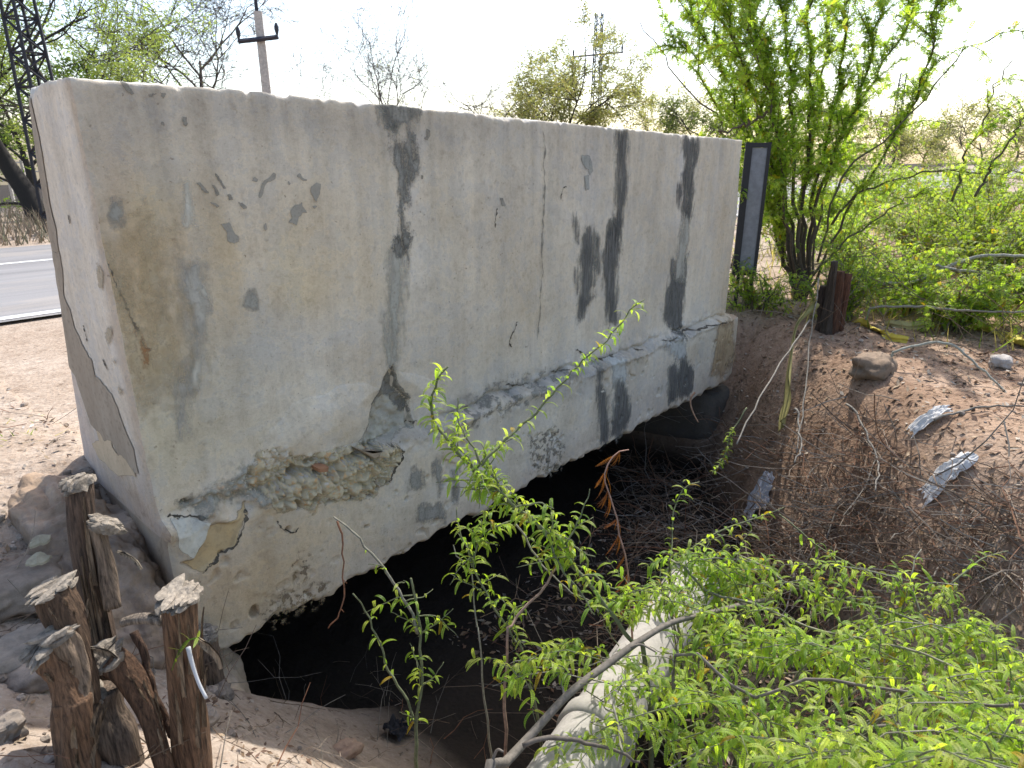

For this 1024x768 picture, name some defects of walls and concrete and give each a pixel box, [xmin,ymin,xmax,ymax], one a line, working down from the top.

peeling [29,97,138,477]
water stain [378,104,421,371]
crack [509,134,567,347]
water stain [573,130,630,324]
water stain [664,135,700,405]
spalling [170,364,414,572]
water stain [596,354,631,443]